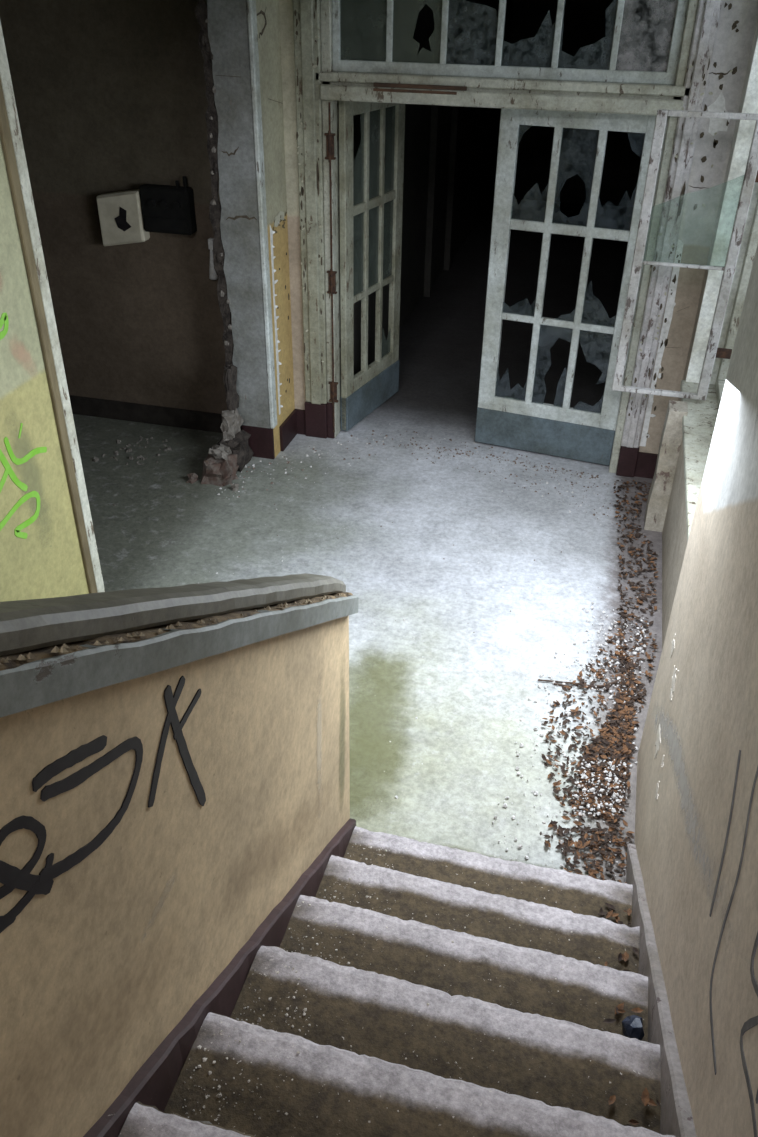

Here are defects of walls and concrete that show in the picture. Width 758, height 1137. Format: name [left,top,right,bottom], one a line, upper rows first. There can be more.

spalling [186,0,254,491]
peeling [628,239,683,447]
peeling [658,182,706,236]
peeling [689,58,737,183]